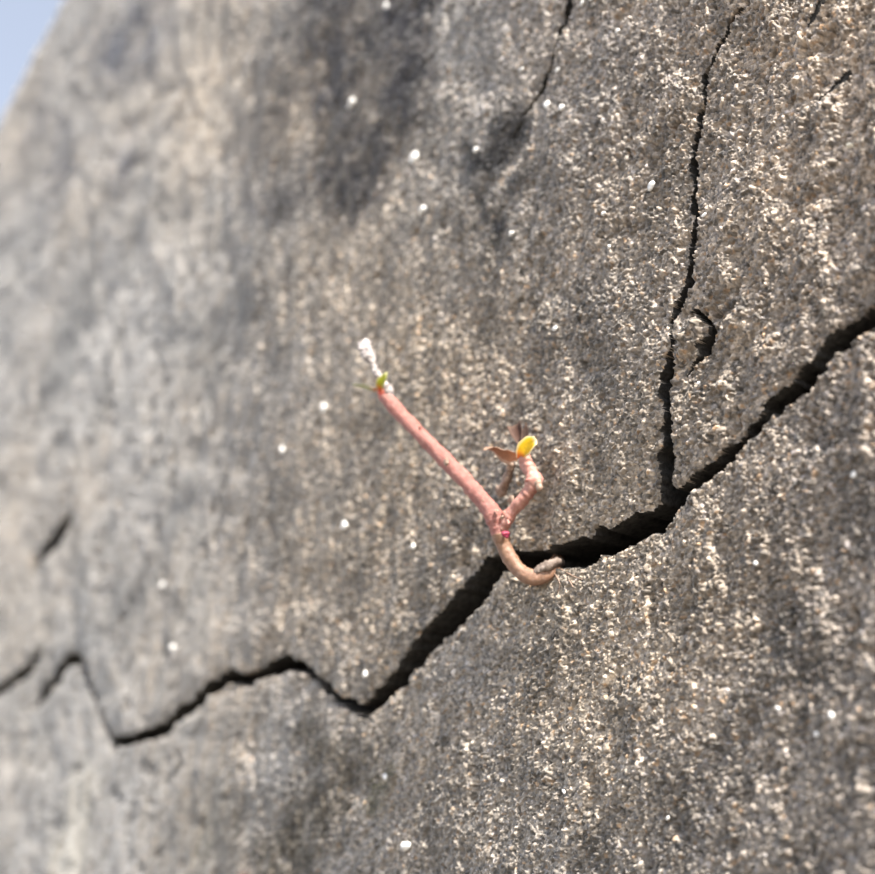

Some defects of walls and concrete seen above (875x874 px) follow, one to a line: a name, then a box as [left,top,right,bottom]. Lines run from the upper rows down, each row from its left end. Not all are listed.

crack [515,0,875,571]
crack [0,649,44,696]
crack [32,556,514,749]